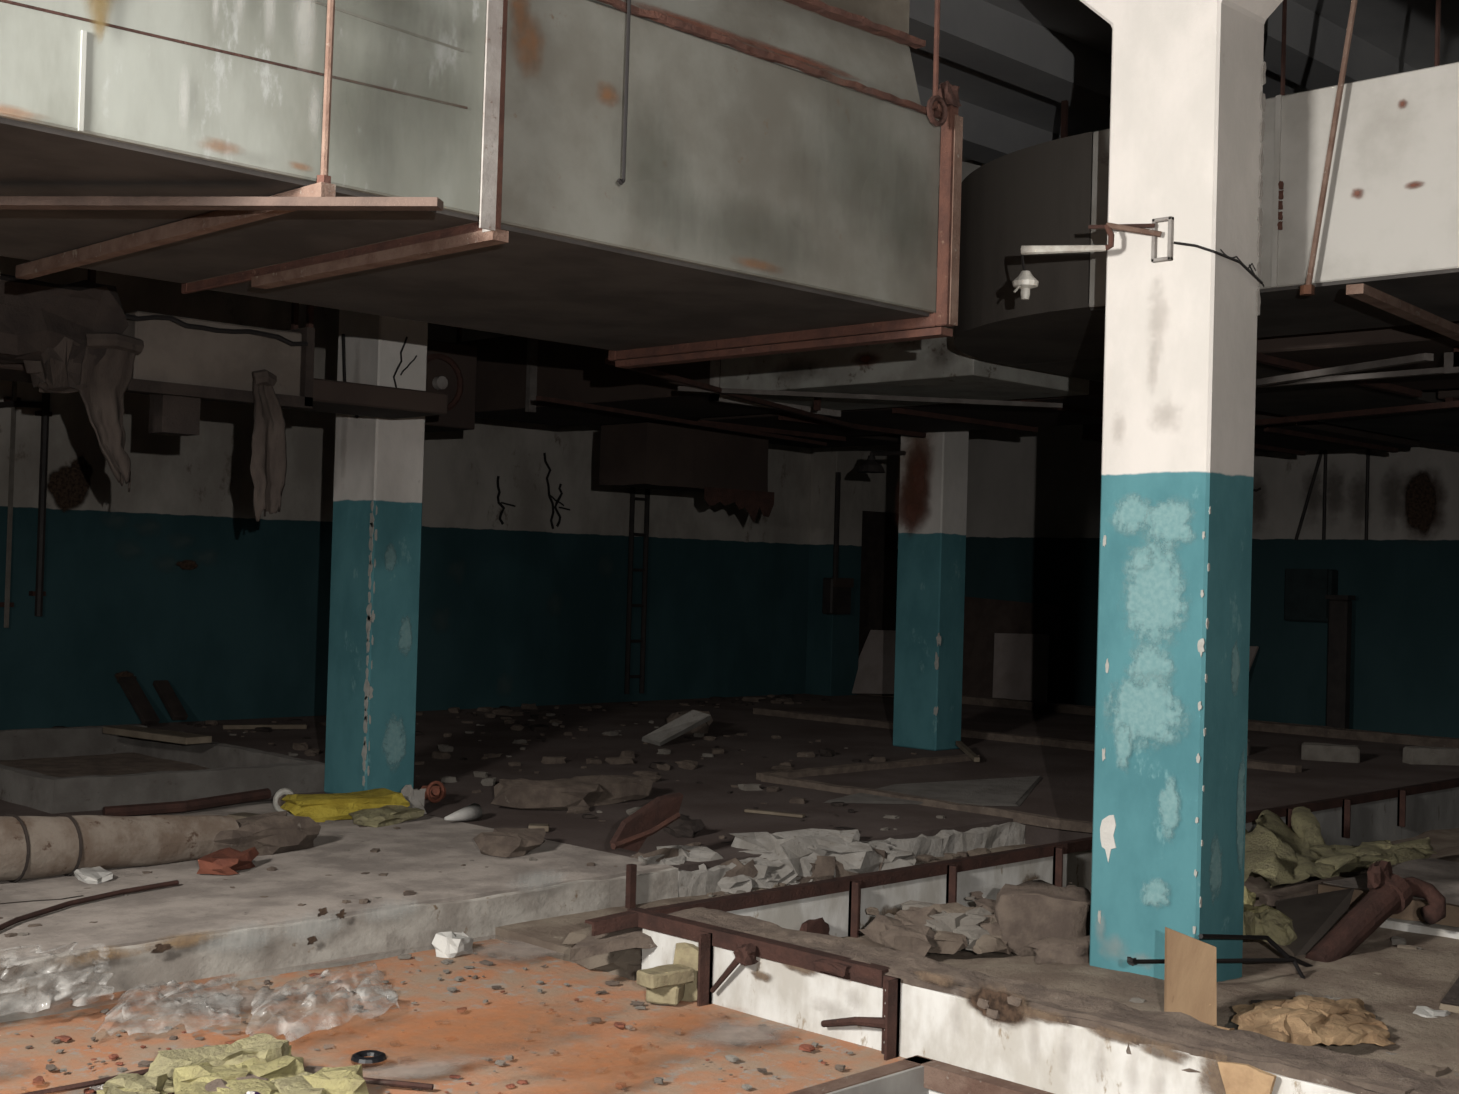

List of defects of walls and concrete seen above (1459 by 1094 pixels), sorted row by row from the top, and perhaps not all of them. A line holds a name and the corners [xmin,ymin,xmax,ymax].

corrosion [646,7,848,76]
crack [496,453,570,529]
corrosion [900,437,927,527]
peeling [361,501,405,786]
peeling [1102,495,1211,767]
spalling [1100,815,1116,863]
peeling [1142,879,1169,906]